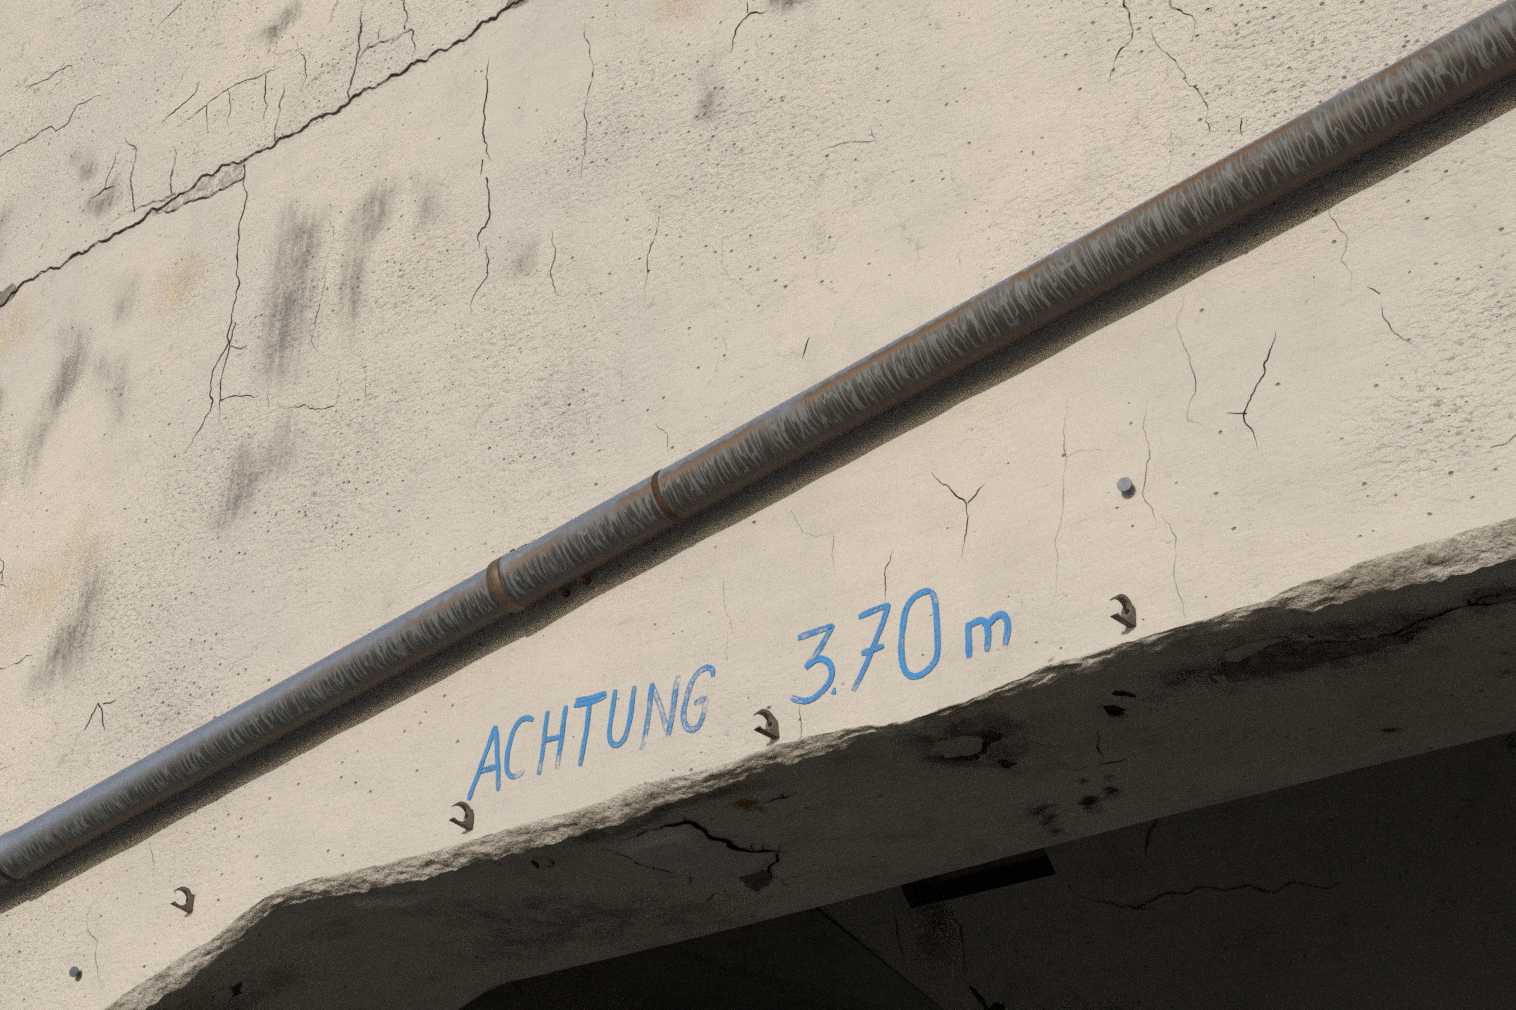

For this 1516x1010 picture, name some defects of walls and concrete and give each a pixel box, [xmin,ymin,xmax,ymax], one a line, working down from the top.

crack [731,5,768,50]
crack [1108,0,1242,131]
crack [0,0,523,450]
crack [1187,332,1276,448]
spalling [930,733,1016,768]
crack [606,817,799,903]
crack [1084,882,1344,910]